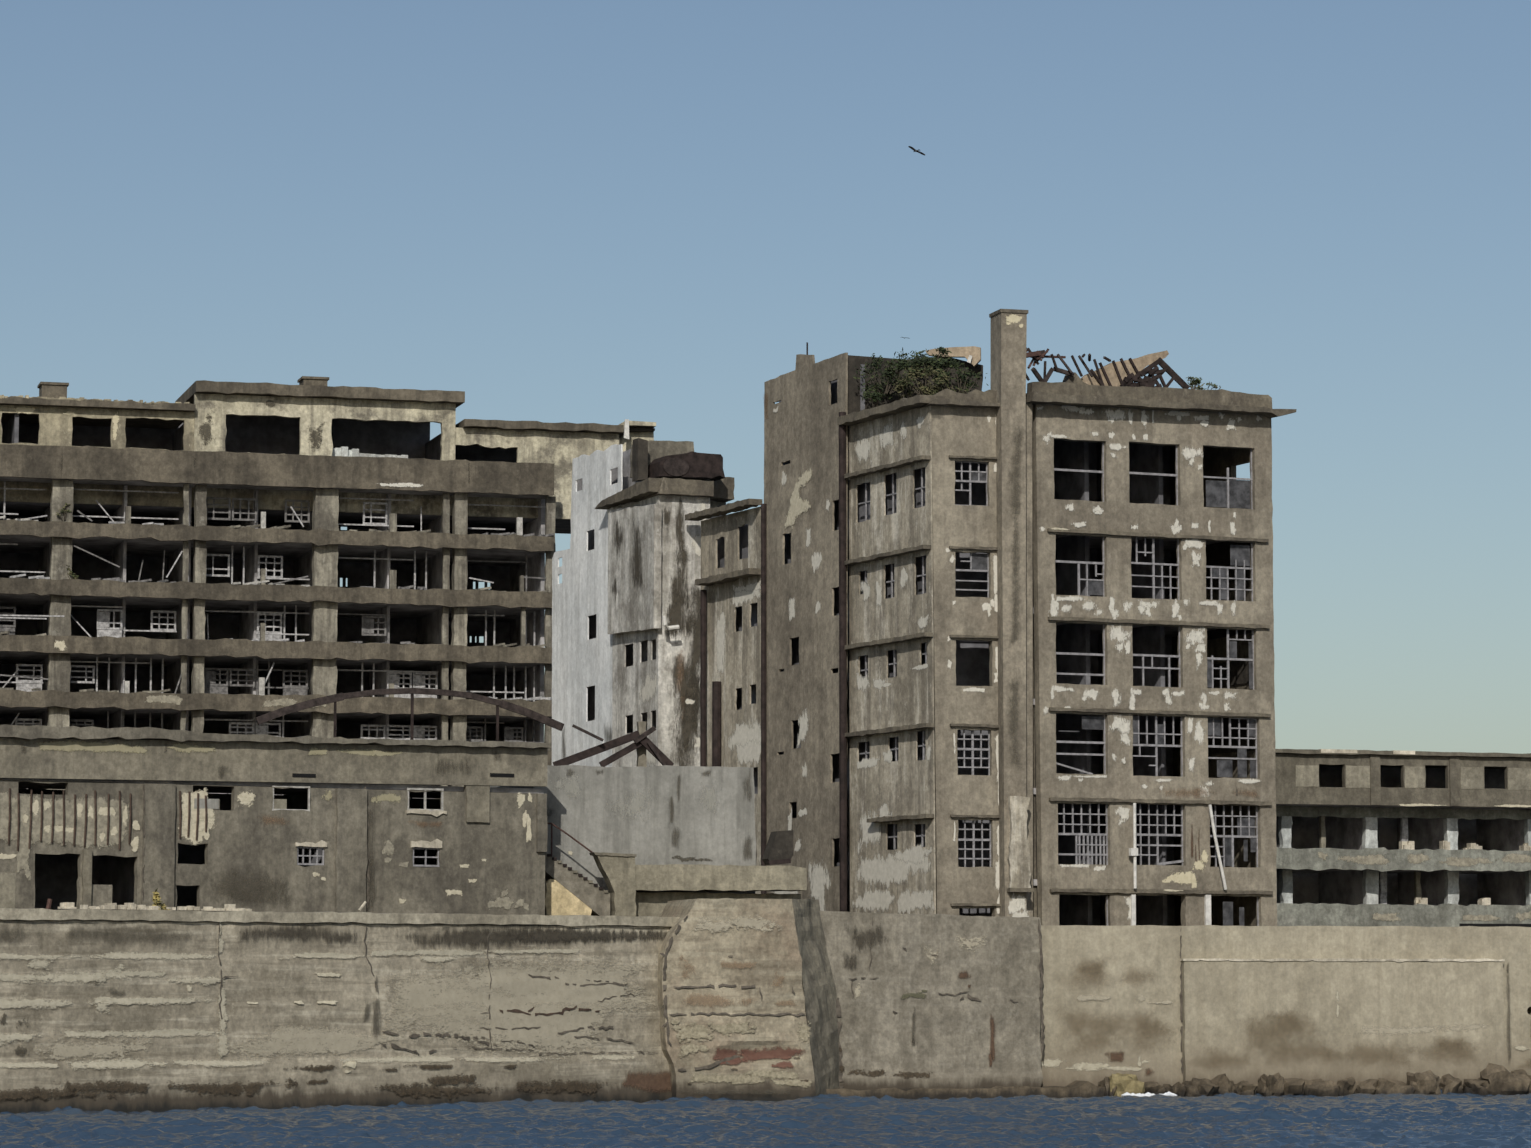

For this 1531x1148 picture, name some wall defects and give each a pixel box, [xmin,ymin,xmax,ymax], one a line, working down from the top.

leakage [612,500,711,845]
peeling [717,580,761,673]
peeling [781,467,830,573]
peeling [963,646,998,692]
peeling [982,556,998,617]
peeling [1048,594,1236,667]
peeling [1171,518,1211,567]
peeling [797,708,809,745]
spalling [0,788,140,881]
peeling [772,808,831,911]
peeling [852,803,934,914]
peeling [995,826,1029,917]